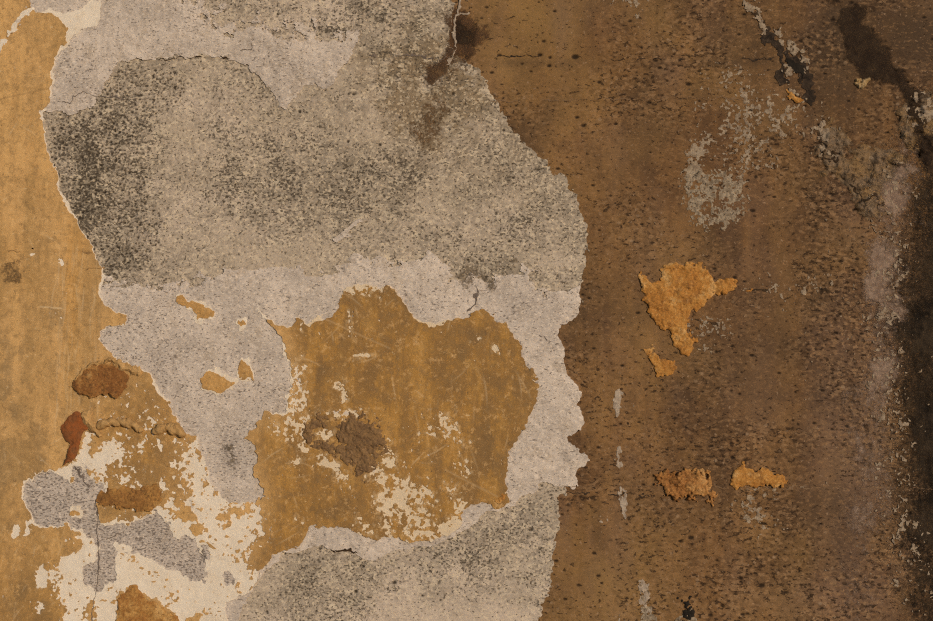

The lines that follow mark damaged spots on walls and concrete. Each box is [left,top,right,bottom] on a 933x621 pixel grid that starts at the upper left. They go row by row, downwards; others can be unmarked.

peeling [11,0,590,621]
spalling [638,579,657,621]
spalling [675,595,697,621]
leakage [831,0,933,620]